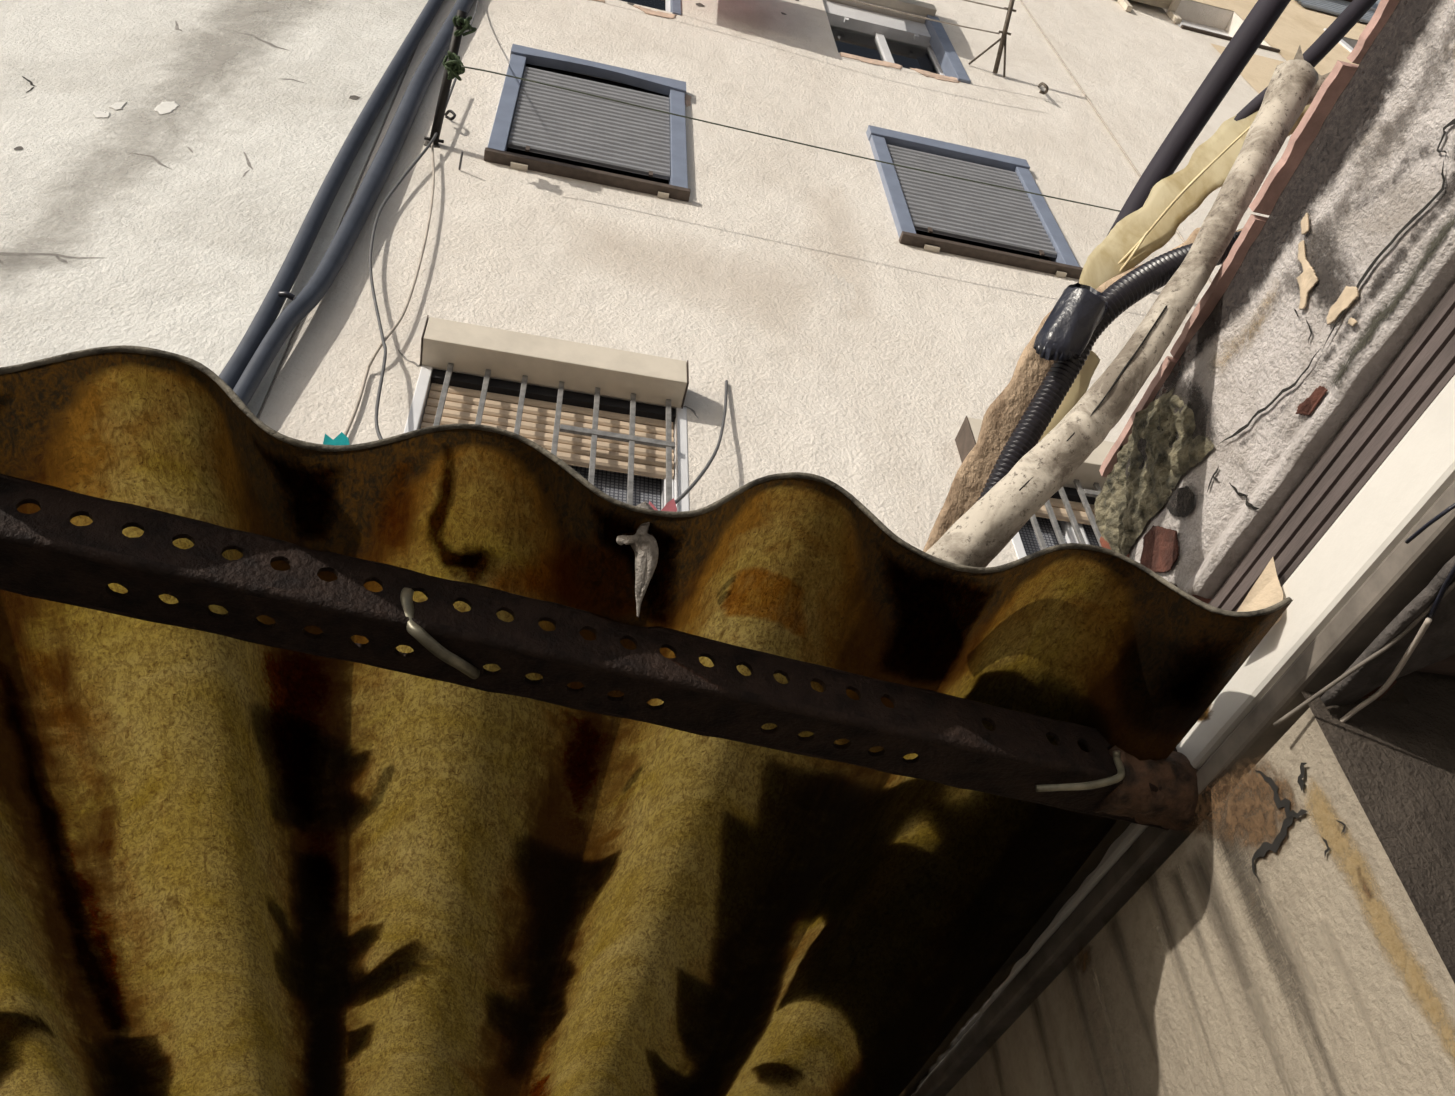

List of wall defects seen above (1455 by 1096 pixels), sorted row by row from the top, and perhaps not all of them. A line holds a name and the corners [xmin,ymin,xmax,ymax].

water stain [1152,0,1455,402]
peeling [1296,213,1319,310]
crack [1207,119,1455,510]
peeling [1326,286,1359,327]
flaking render [1295,386,1328,416]
flaking render [1140,486,1195,573]
crack [1252,762,1346,883]